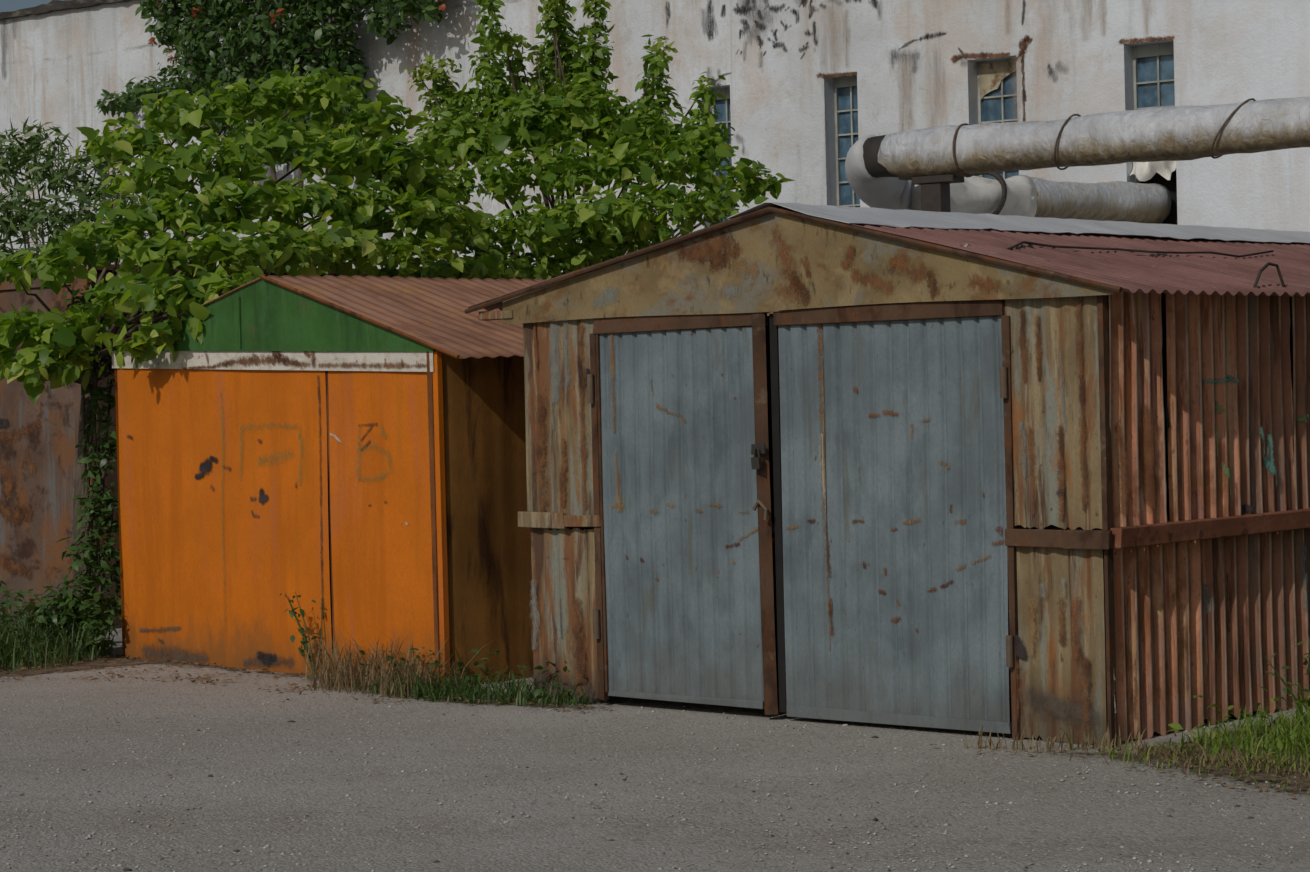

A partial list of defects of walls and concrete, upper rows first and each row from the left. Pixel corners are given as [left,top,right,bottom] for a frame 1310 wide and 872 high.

damp [704,0,716,37]
corrosion [677,230,759,278]
corrosion [841,245,939,298]
corrosion [535,324,590,512]
corrosion [787,324,833,650]
corrosion [927,527,1004,592]
corrosion [531,582,539,649]